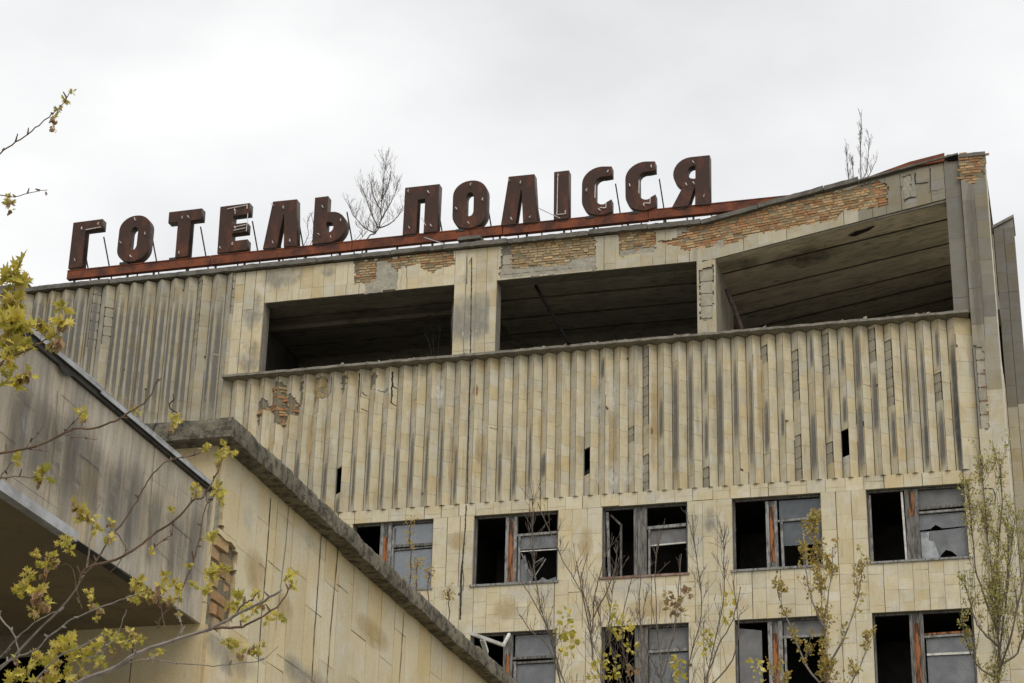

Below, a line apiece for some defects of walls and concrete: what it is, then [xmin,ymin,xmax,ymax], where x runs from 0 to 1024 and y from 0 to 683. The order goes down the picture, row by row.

spalling [956,152,989,184]
spalling [354,252,456,294]
spalling [499,236,597,278]
spalling [618,180,889,257]
spalling [256,377,328,427]
leakage [652,361,769,467]
leakage [811,340,879,467]
leakage [921,334,963,470]
leakage [336,432,457,513]
leakage [498,433,545,493]
spalling [206,487,234,631]